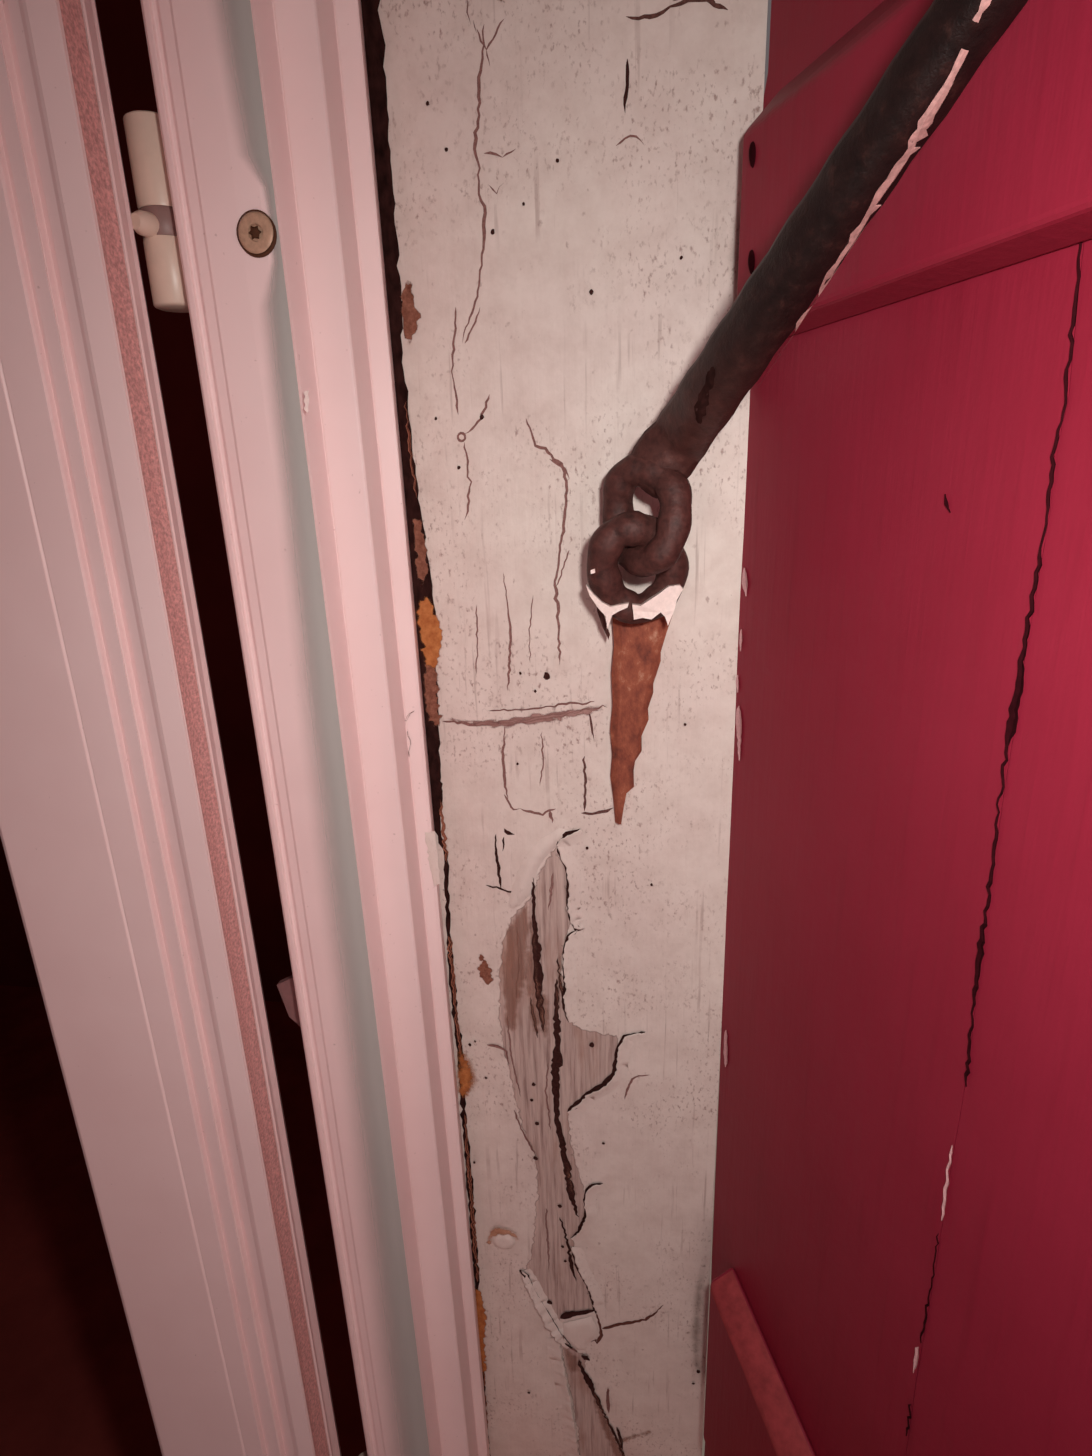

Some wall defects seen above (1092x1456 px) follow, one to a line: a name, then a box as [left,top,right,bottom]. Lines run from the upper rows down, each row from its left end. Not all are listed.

crack [626,0,728,20]
crack [616,59,643,146]
crack [451,19,515,518]
crack [475,419,570,691]
rust [417,597,442,726]
crack [964,242,1082,1087]
crack [487,715,612,893]
peeling [477,829,649,1456]
crack [920,1233,939,1343]
crack [905,1404,913,1436]